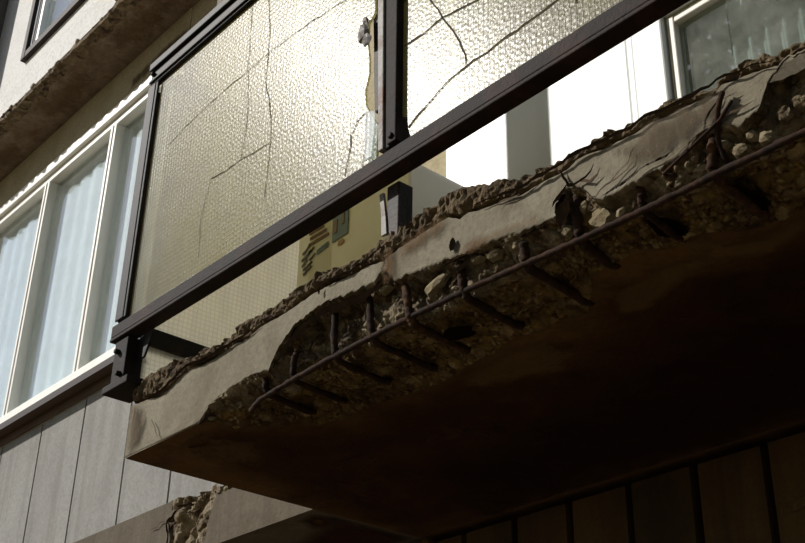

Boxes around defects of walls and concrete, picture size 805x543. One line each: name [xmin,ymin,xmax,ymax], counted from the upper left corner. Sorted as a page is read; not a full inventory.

spalling [0,0,142,136]
crack [474,61,771,207]
spalling [196,51,805,430]
crack [500,226,547,244]
damp [128,408,143,447]
damp [189,245,805,543]
crack [151,502,194,543]
spalling [168,483,228,543]